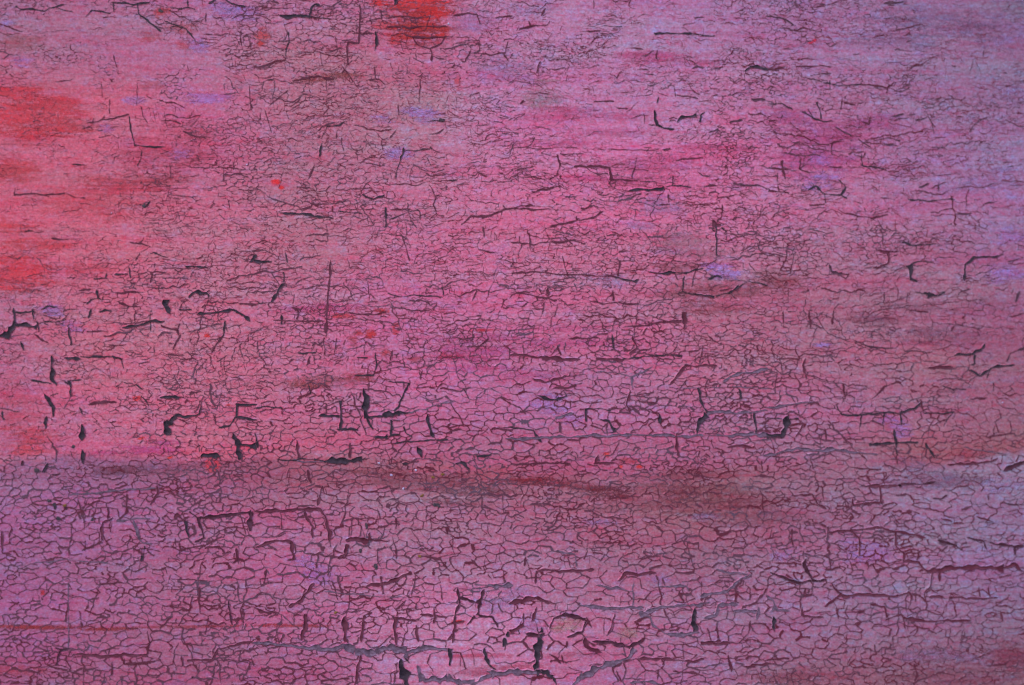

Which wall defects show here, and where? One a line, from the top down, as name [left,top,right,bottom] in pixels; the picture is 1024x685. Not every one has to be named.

crack [15,0,255,48]
crack [249,0,552,131]
crack [632,17,715,75]
crack [82,55,206,201]
crack [14,190,85,240]
crack [0,242,321,464]
crack [171,58,1024,685]
crack [21,461,60,476]
crack [0,531,11,555]
crack [34,485,160,585]
crack [39,617,171,675]